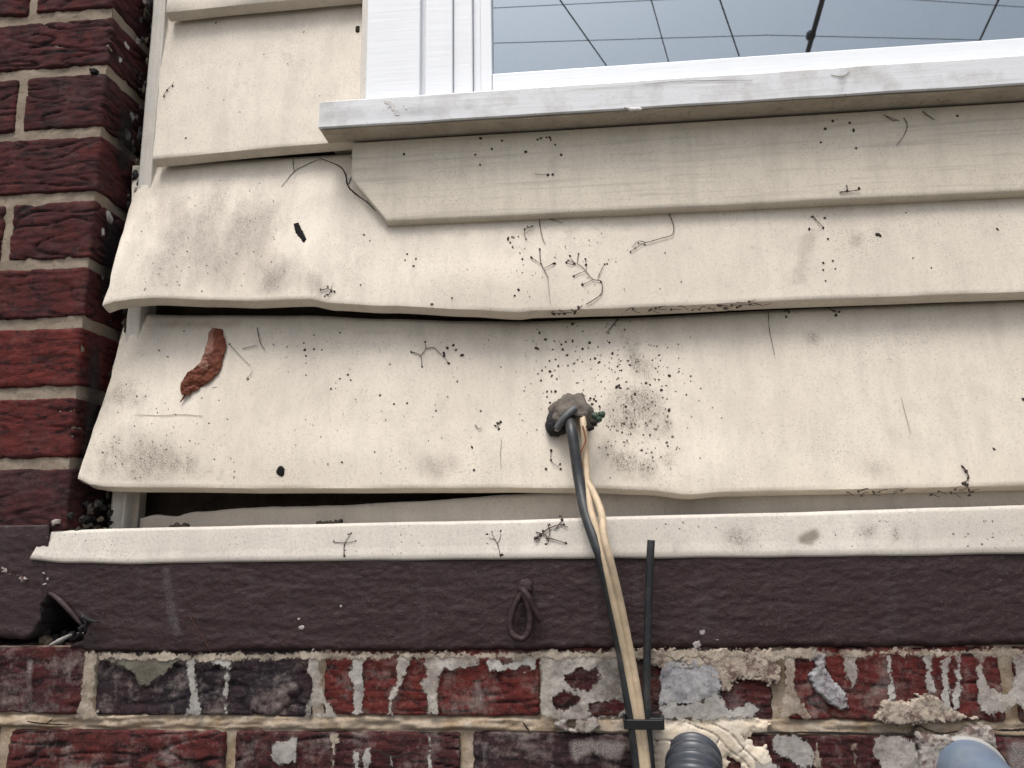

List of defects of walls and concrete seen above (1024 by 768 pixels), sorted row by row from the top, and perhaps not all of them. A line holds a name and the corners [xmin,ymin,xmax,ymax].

spalling [38,572,99,647]
leakage [98,648,616,663]
leakage [634,647,824,662]
leakage [846,646,1023,710]
leakage [659,694,759,722]
leakage [572,740,625,761]
leakage [812,743,822,768]